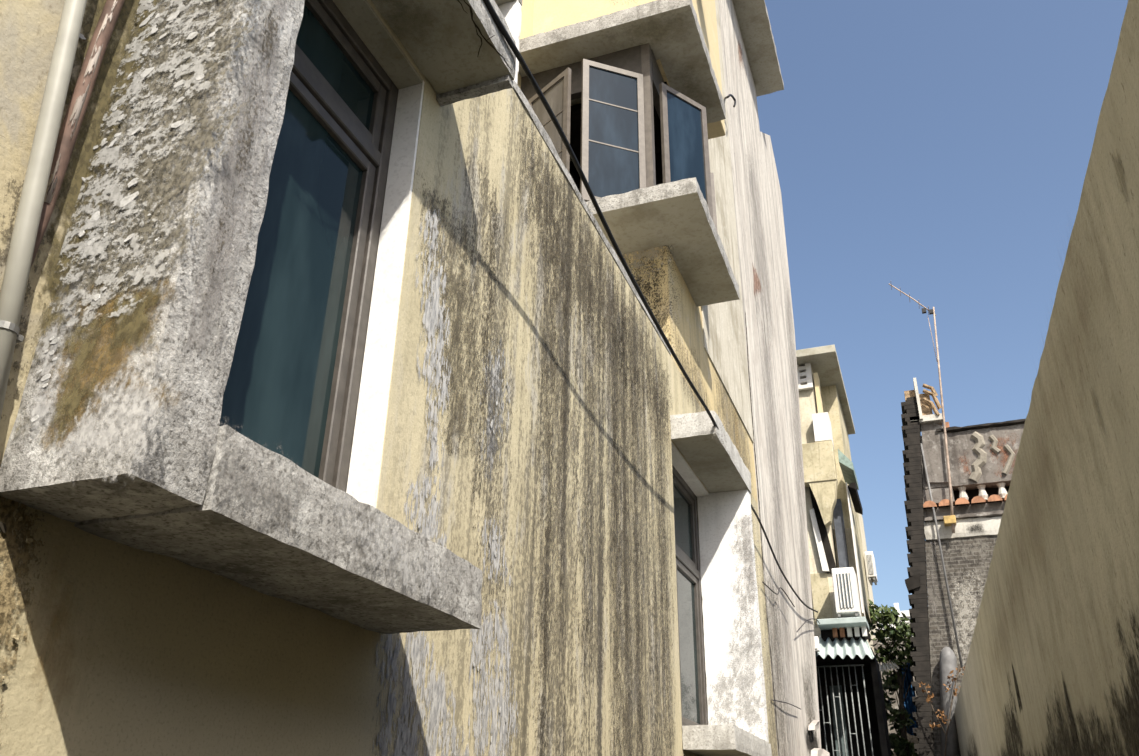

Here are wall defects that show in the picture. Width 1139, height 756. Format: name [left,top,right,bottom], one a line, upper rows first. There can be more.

water stain [0,179,24,273]
peeling [29,0,262,428]
water stain [57,350,177,477]
water stain [416,154,514,642]
water stain [514,115,752,756]
water stain [335,500,440,599]
water stain [1012,665,1022,712]
water stain [1063,681,1078,742]